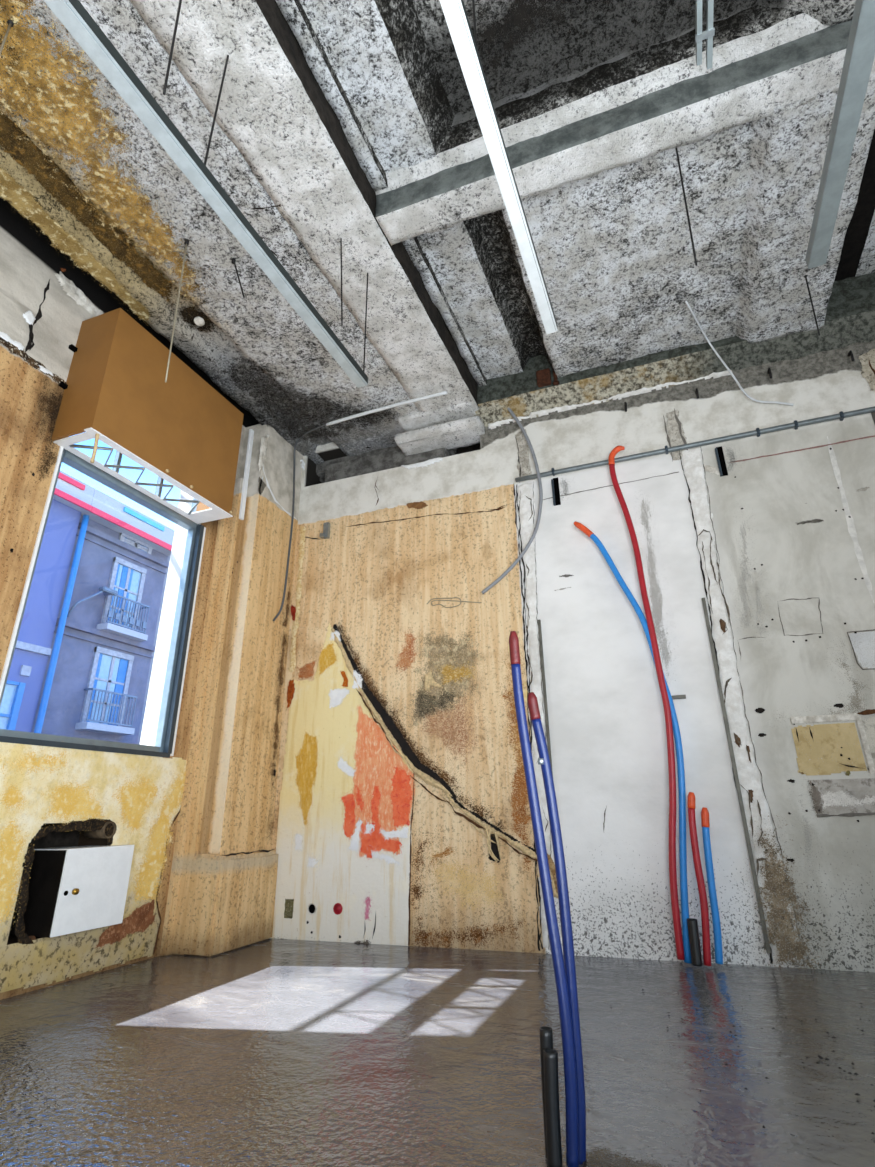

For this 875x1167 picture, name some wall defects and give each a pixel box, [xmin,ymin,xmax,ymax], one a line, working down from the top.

leakage [465,0,705,95]
leakage [0,0,223,326]
spalling [23,310,36,325]
peeling [0,331,67,384]
peeling [328,670,363,709]
peeling [337,756,356,778]
peeling [347,820,408,867]
spalling [15,818,114,945]